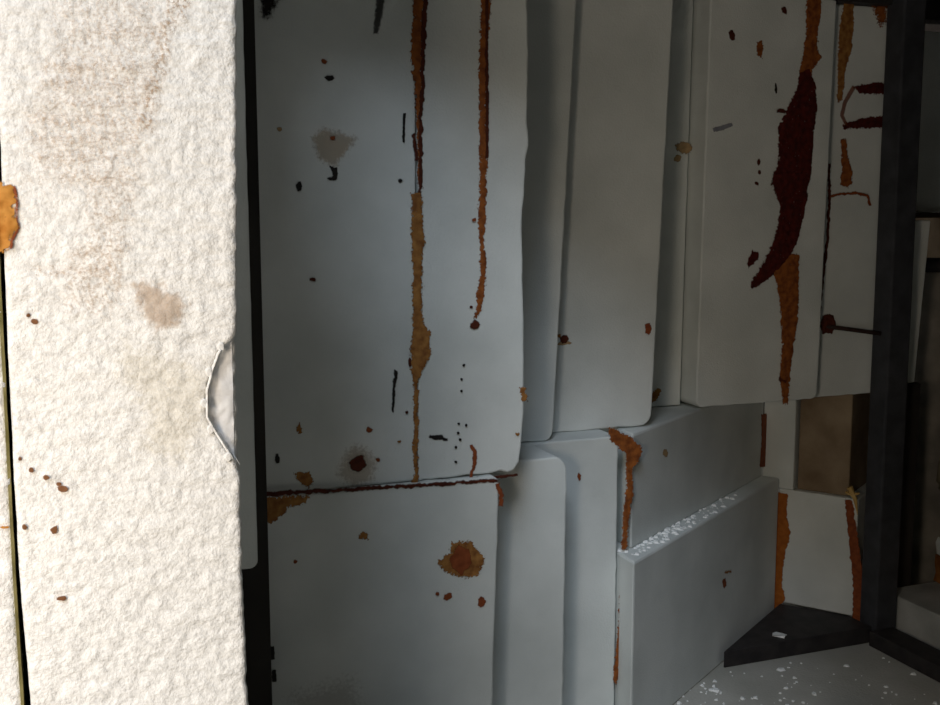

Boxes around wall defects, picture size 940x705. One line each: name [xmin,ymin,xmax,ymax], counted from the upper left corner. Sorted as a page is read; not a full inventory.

rust [872,6,887,27]
rust [830,4,884,206]
rust [0,182,20,253]
rust [267,0,518,524]
rust [747,0,822,405]
rust [821,314,836,334]
spalling [200,340,240,464]
rust [608,427,643,550]
rust [438,540,485,579]
rust [774,492,791,608]
rust [845,500,862,621]